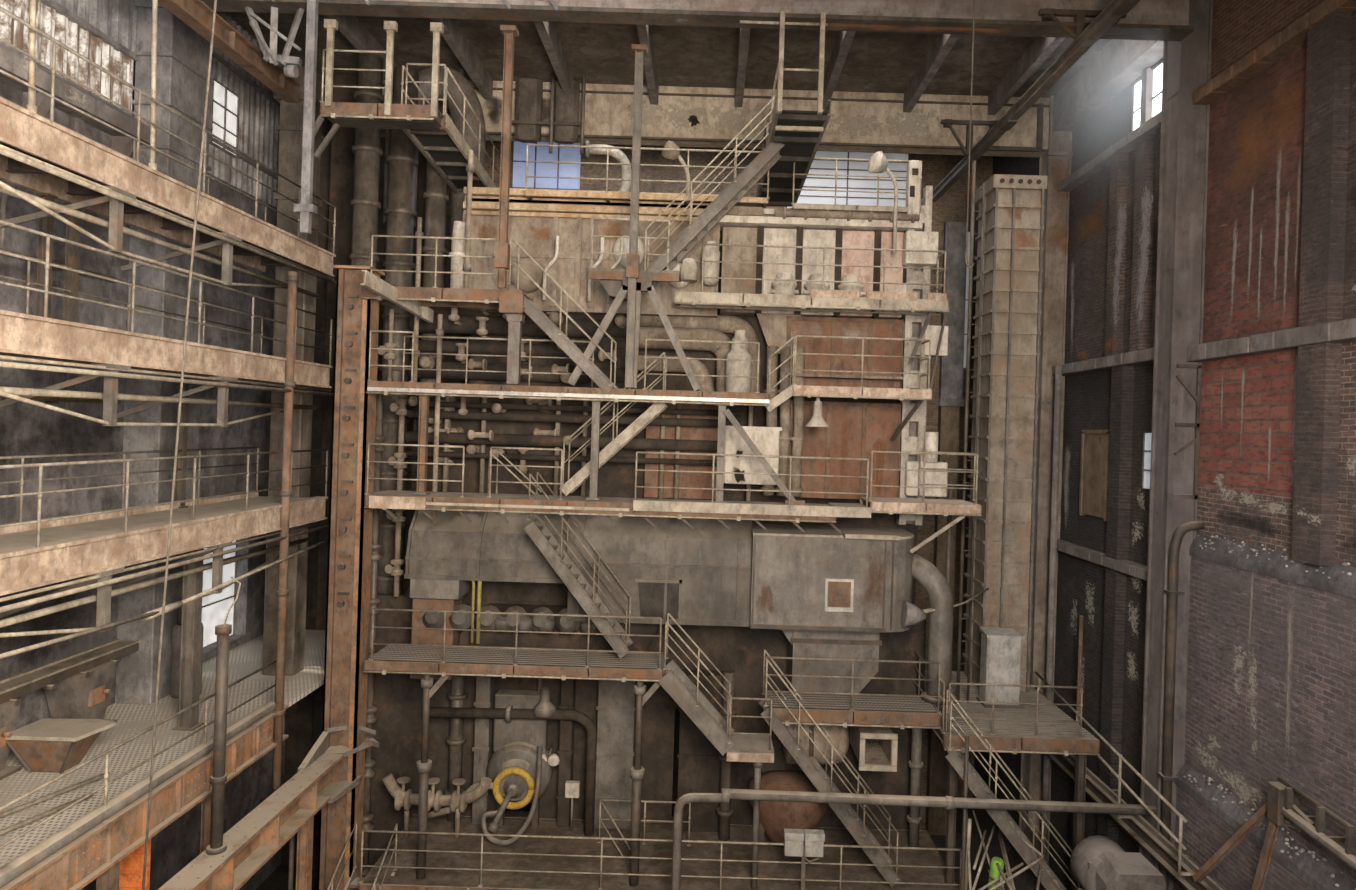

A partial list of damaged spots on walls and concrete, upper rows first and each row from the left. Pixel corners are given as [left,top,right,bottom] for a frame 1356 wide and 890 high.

damp [1113,186,1153,331]
efflorescence [1232,147,1301,305]